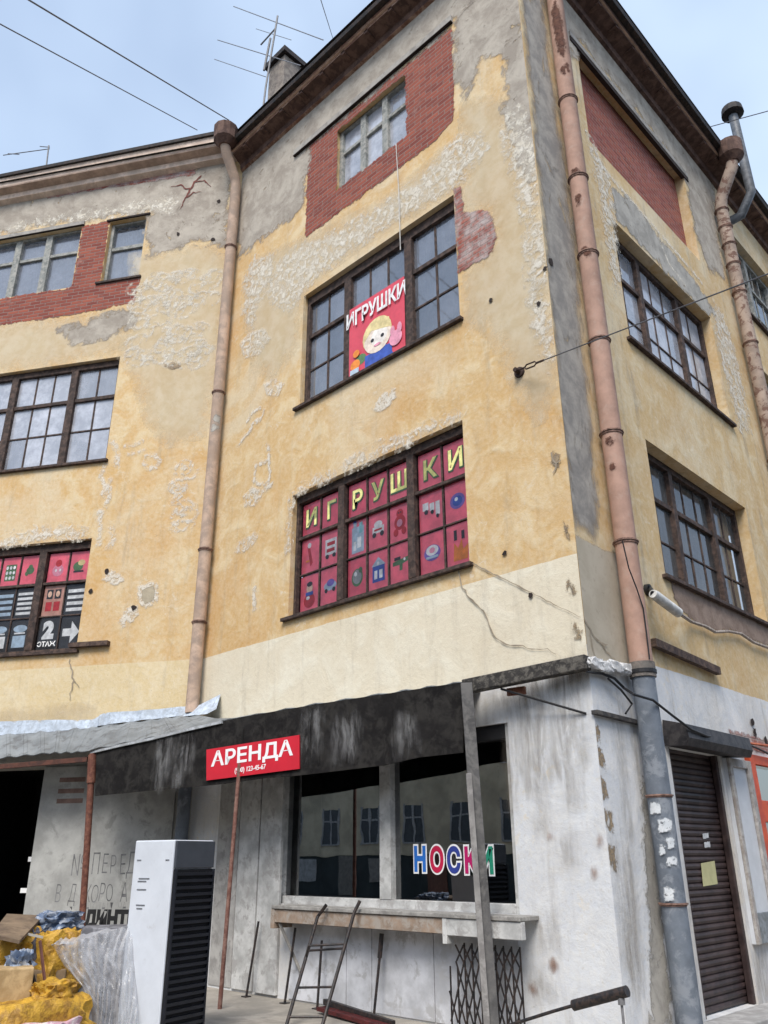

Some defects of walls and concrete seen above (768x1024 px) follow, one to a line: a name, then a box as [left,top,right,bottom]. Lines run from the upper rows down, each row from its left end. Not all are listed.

rust [551,0,570,74]
crack [171,176,211,209]
flaking render [0,0,598,553]
crack [458,563,616,660]
spalling [596,723,614,831]
spalling [608,845,617,872]